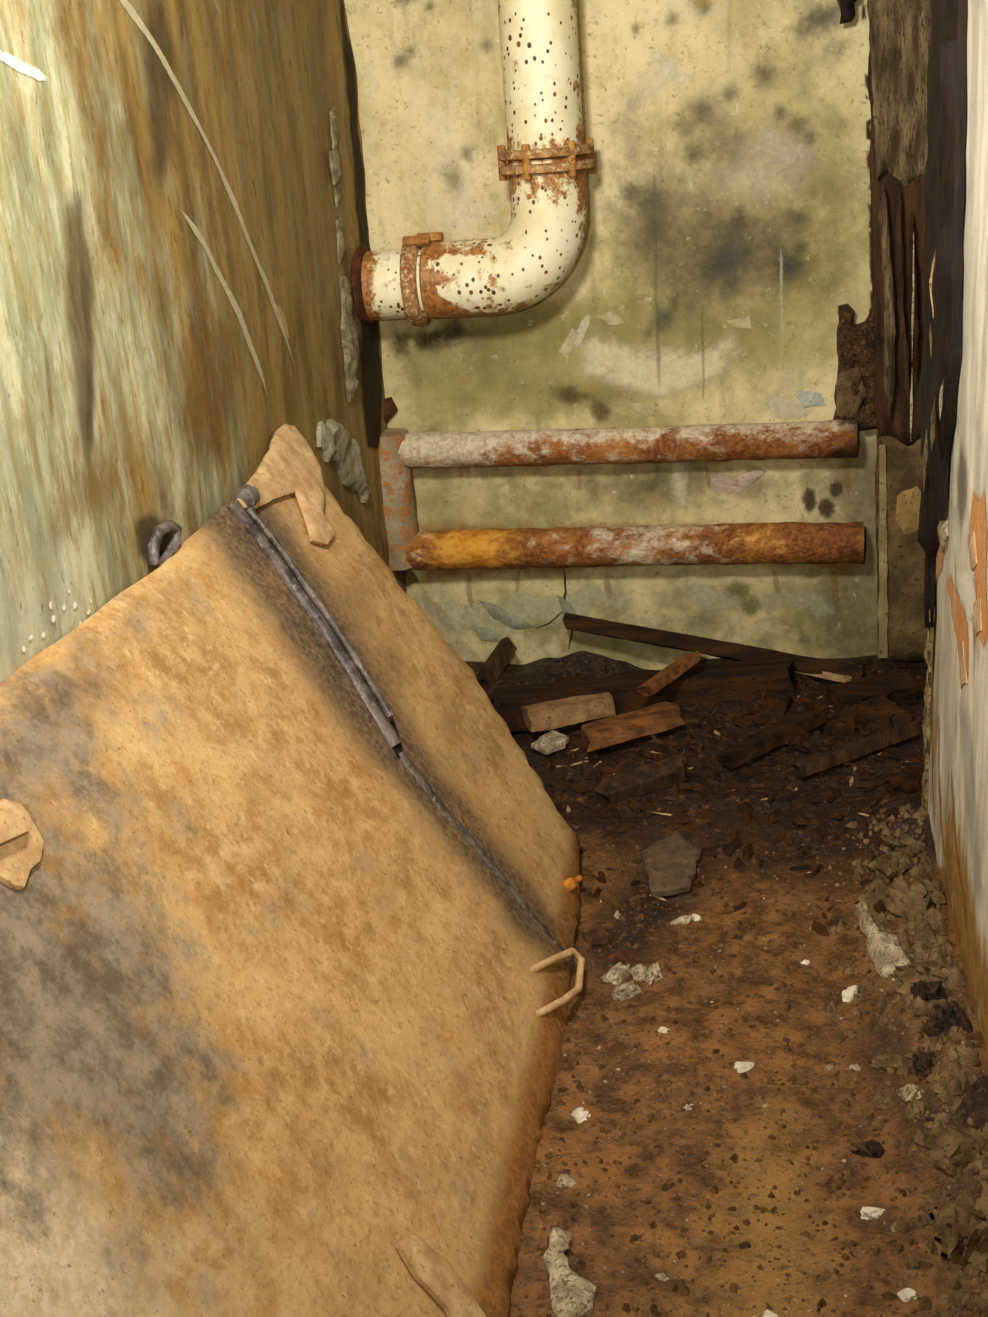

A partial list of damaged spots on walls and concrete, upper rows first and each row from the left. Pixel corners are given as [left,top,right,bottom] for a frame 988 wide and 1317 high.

peeling [921,492,987,811]